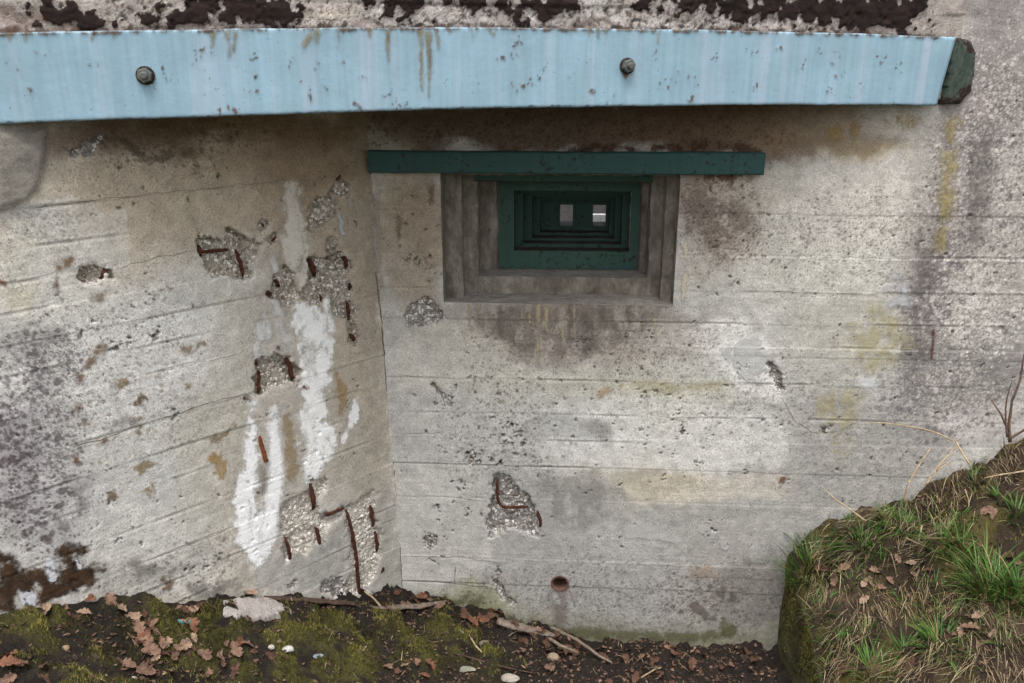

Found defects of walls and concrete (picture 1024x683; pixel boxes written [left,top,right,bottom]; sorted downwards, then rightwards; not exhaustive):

corrosion [0,26,778,79]
spalling [76,264,113,284]
spalling [195,219,278,281]
spalling [265,175,360,347]
water stain [253,181,359,486]
spalling [404,296,446,327]
spalling [251,355,301,395]
water stain [231,399,285,569]
spalling [279,477,385,597]
spalling [485,472,542,537]